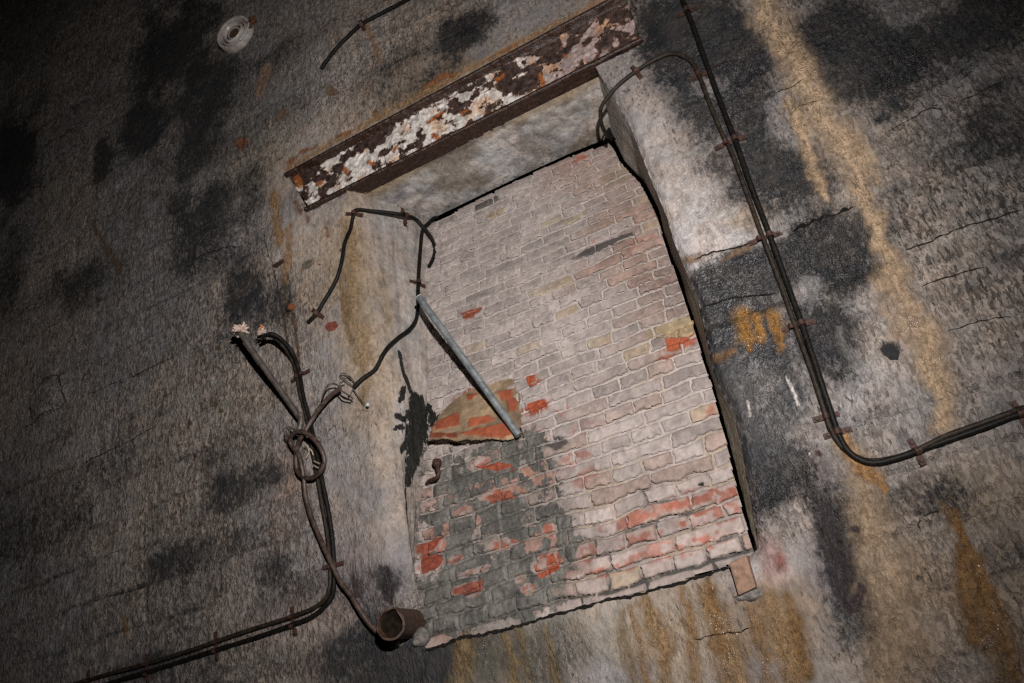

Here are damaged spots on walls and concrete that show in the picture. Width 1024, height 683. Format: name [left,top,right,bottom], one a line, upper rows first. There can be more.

corrosion [286,0,603,188]
crack [889,78,1009,131]
crack [694,243,748,260]
crack [793,205,856,232]
leakage [756,0,953,429]
crack [905,209,1021,250]
crack [923,267,1011,330]
peeling [415,374,587,639]
leakage [833,433,916,683]
corrosion [618,585,813,683]